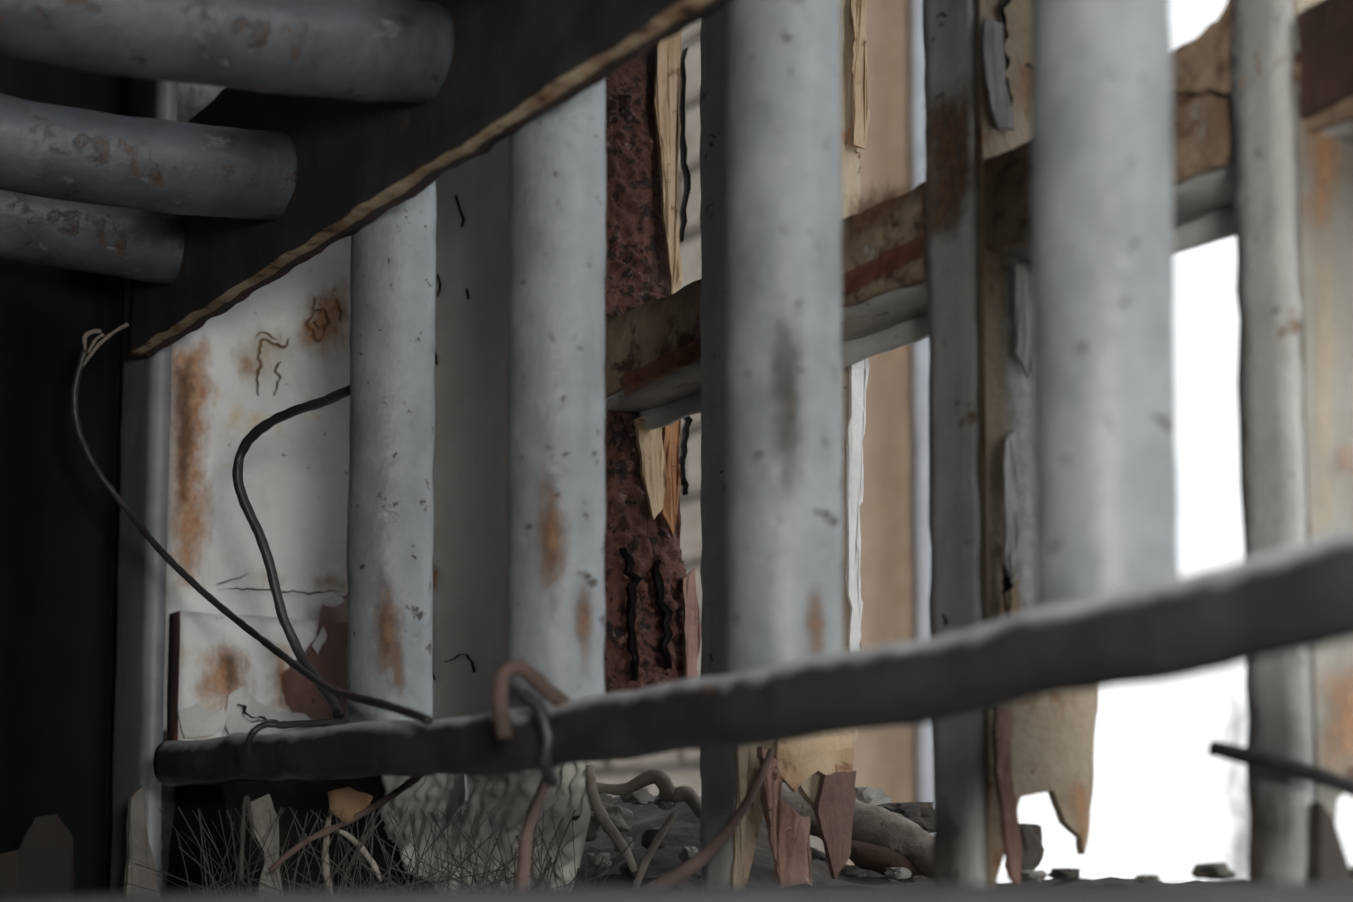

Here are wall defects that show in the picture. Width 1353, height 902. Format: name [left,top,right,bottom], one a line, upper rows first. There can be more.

peeling [849,0,870,149]
corrosion [605,87,660,321]
corrosion [176,350,207,571]
crack [256,295,347,396]
corrosion [604,412,686,694]
corrosion [620,337,701,396]
peeling [845,359,869,650]
corrosion [205,653,239,695]